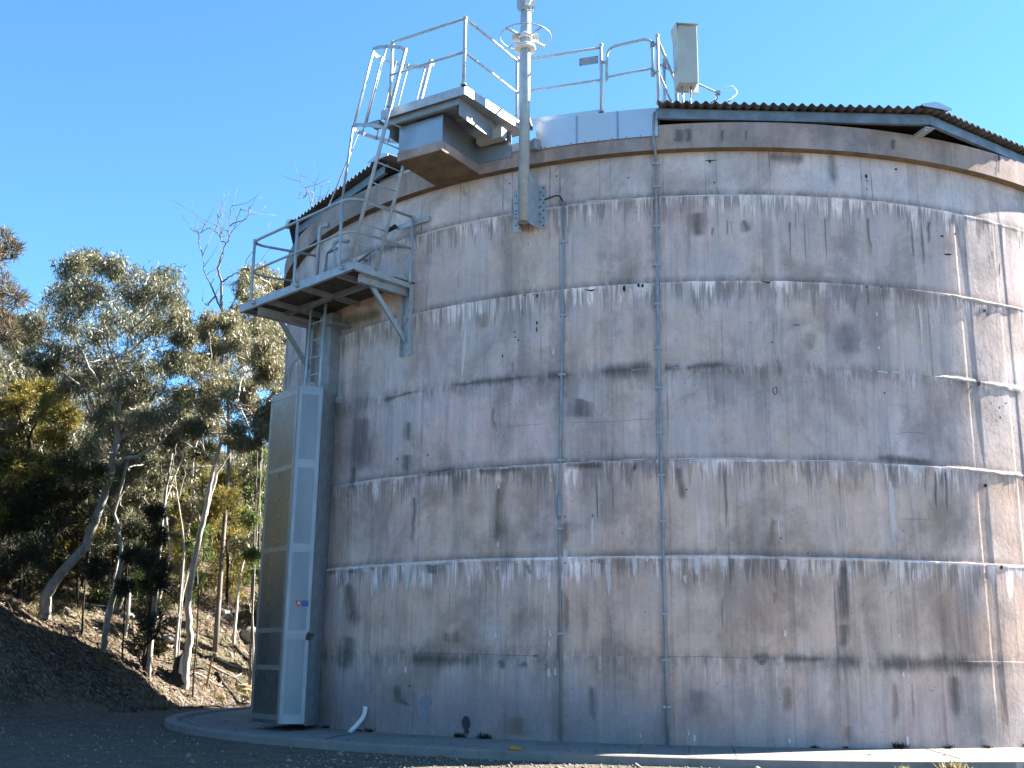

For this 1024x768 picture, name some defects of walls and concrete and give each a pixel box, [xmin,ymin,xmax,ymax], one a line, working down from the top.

water stain [947,466,1022,478]
water stain [332,542,500,598]
water stain [549,519,761,595]
water stain [779,556,897,570]